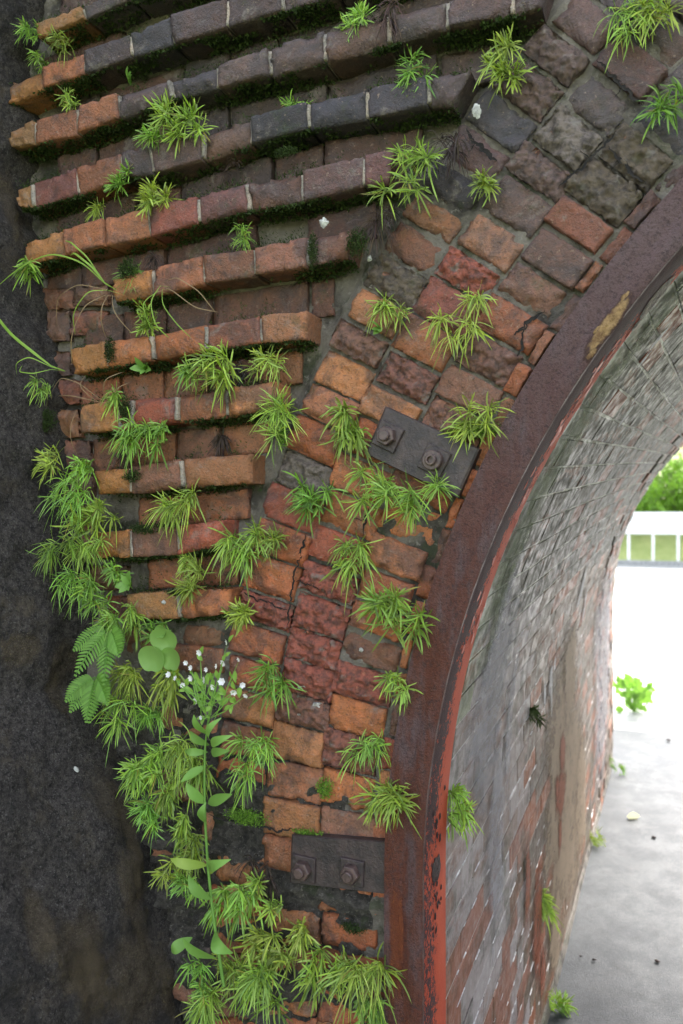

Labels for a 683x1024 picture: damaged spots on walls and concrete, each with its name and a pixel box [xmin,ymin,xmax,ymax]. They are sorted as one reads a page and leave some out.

crack [514,309,545,357]
peeling [549,275,676,450]
crack [241,535,319,627]
corrosion [432,810,442,934]